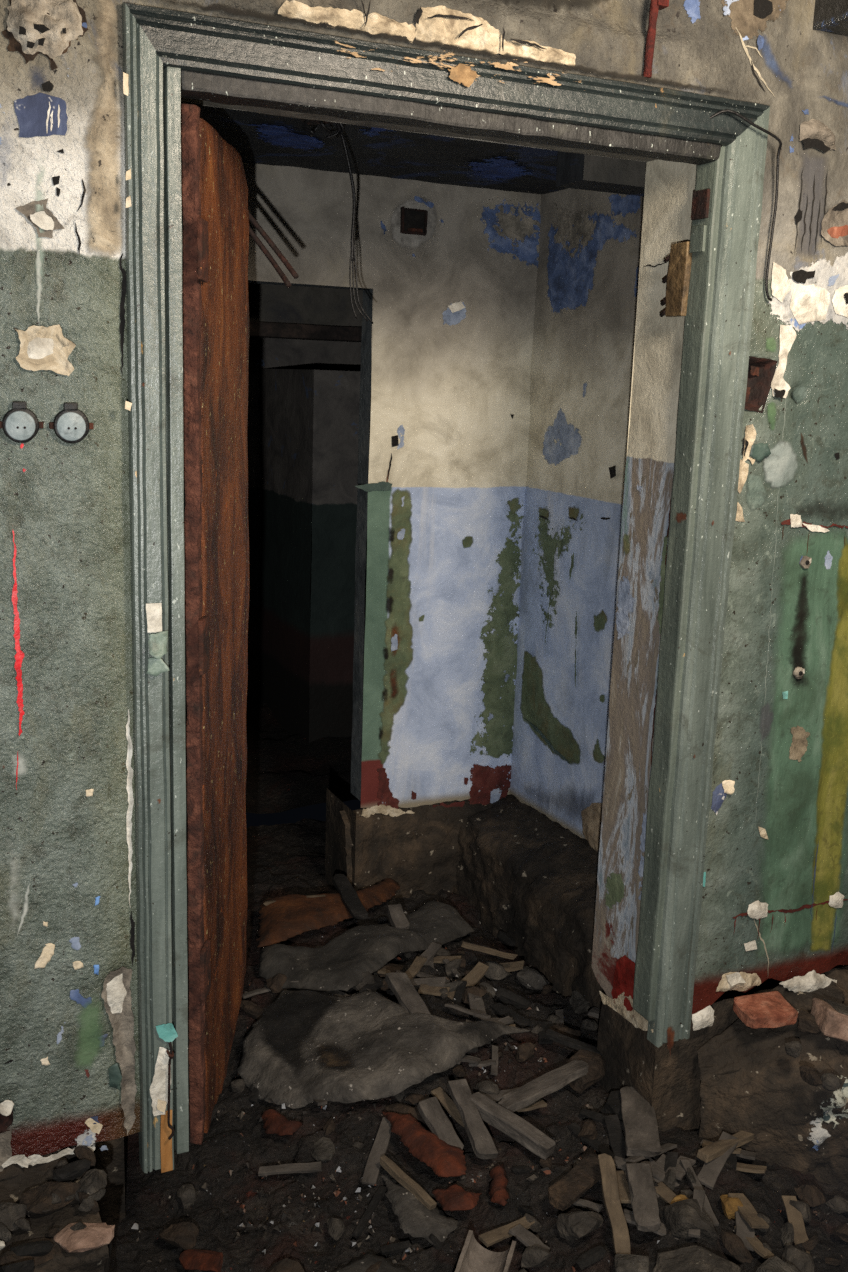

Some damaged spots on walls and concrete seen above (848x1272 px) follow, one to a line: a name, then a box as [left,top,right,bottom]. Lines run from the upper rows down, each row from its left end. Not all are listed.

flaking render [0,0,88,154]
flaking render [278,0,576,87]
peeling [684,0,701,23]
peeling [721,0,789,76]
peeling [480,194,641,313]
flaking render [16,325,76,376]
peeling [735,200,848,522]
peeling [543,408,582,466]
peeling [355,481,424,818]
peeling [433,498,605,808]
flaking render [779,970,837,992]
peeling [807,1076,848,1150]